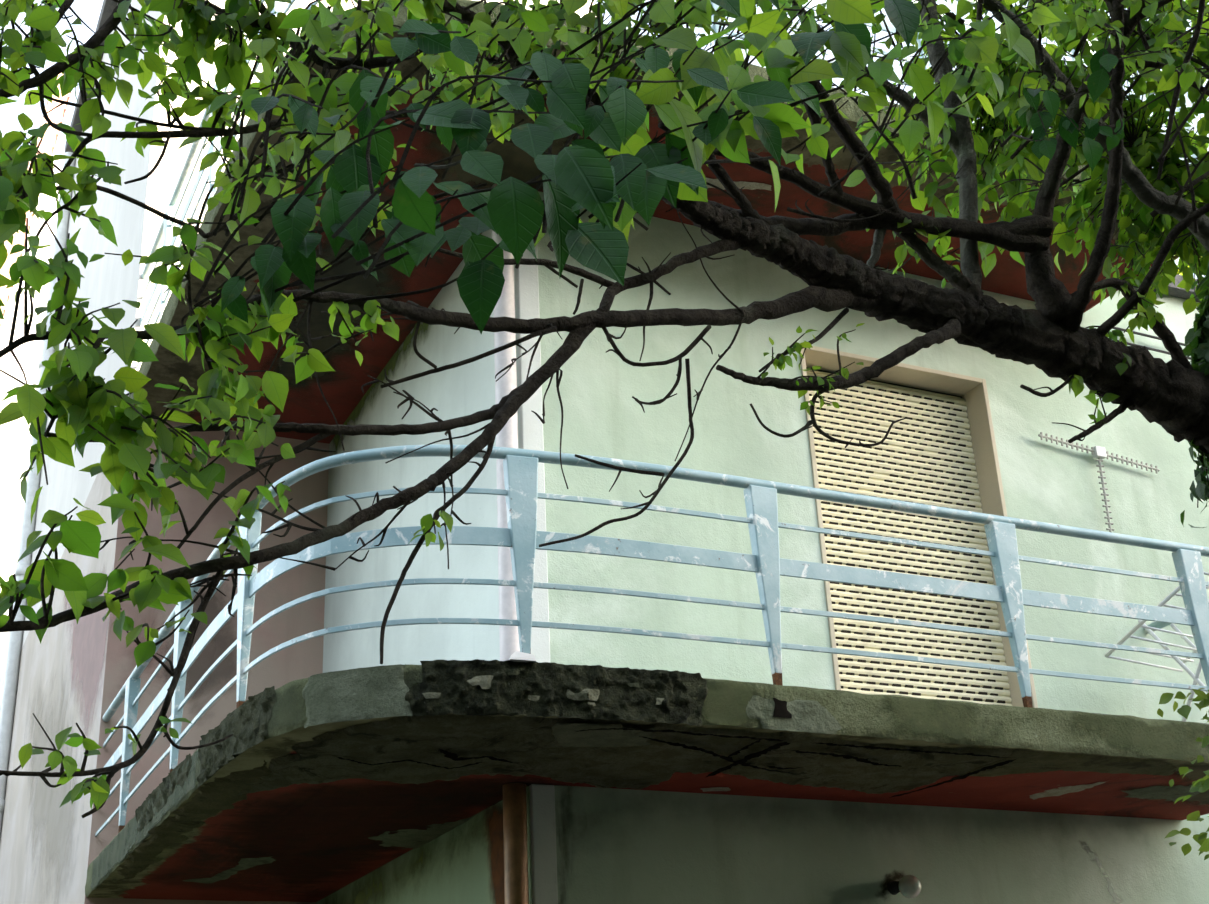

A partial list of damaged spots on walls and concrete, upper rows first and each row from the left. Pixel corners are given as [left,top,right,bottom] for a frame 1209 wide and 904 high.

crack [338,749,514,769]
flaking render [117,651,1200,883]
crack [576,728,1016,798]